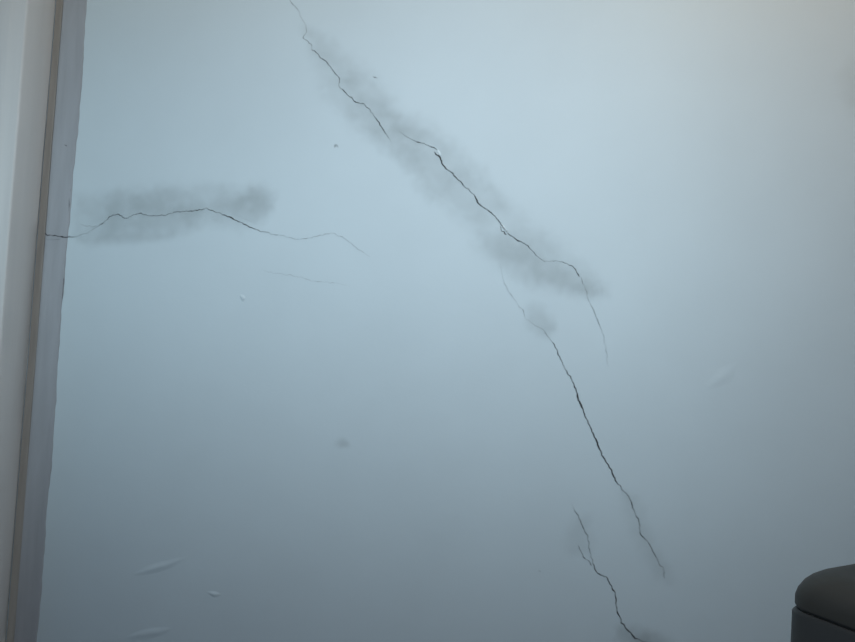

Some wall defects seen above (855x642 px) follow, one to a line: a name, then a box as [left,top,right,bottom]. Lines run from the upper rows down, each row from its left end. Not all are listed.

crack [418,142,529,247]
crack [553,343,619,485]
crack [590,564,637,639]